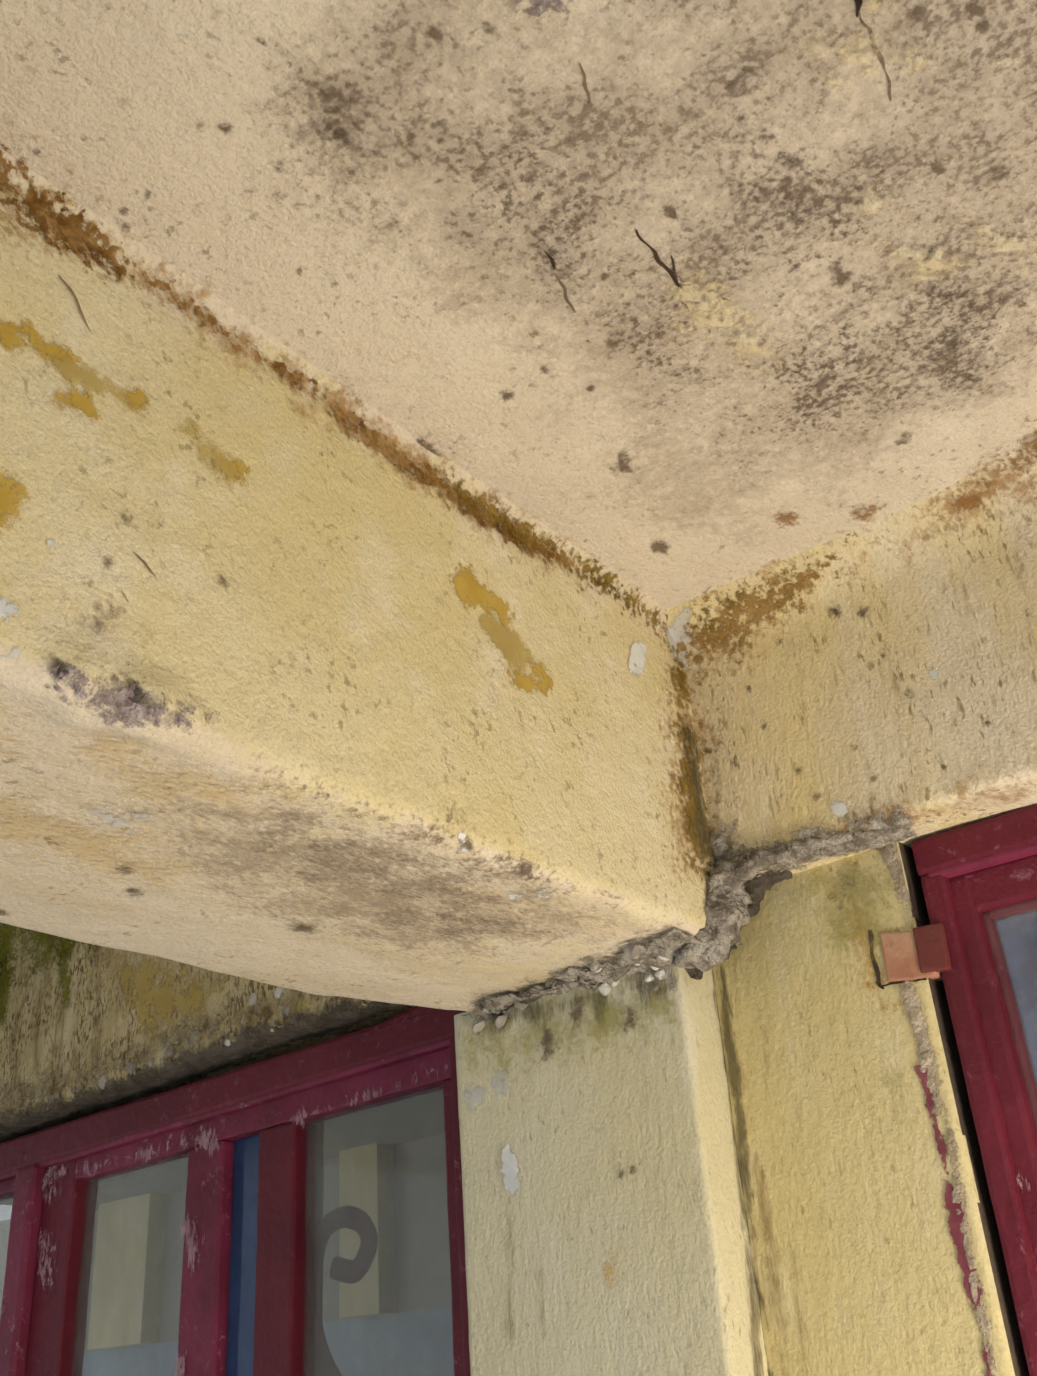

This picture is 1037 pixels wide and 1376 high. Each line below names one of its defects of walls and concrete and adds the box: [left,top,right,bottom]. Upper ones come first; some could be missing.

crack [855,0,892,102]
crack [635,230,683,289]
peeling [0,320,150,420]
corrosion [0,144,618,584]
water stain [874,275,1028,395]
water stain [929,433,1037,520]
peeling [449,564,553,696]
water stain [566,541,855,881]
water stain [403,816,550,883]
spalling [462,800,920,1035]
water stain [713,969,771,1376]
spalling [900,980,997,1376]